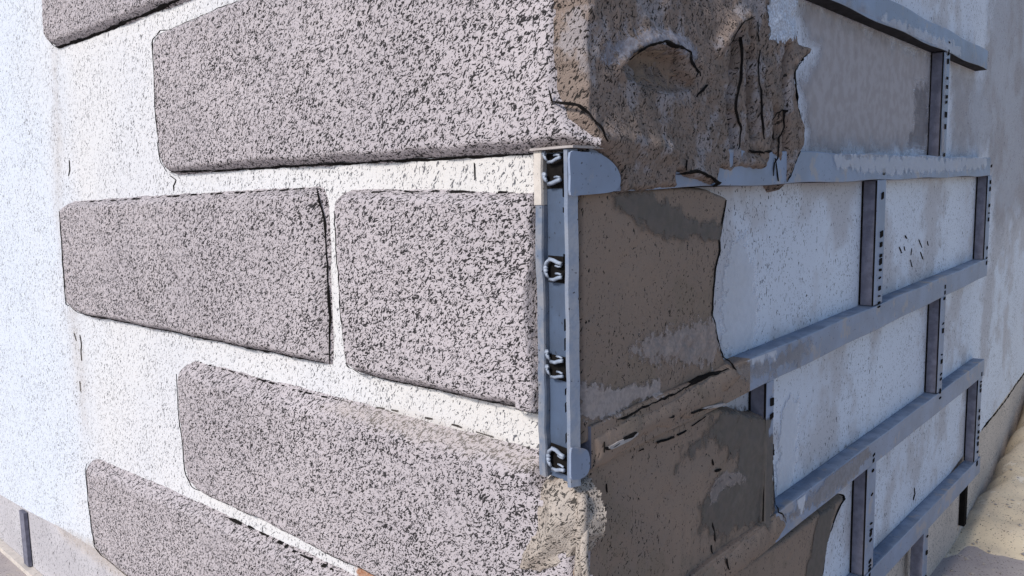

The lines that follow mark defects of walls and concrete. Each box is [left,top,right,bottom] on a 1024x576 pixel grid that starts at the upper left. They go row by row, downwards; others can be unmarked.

crack [629,40,709,97]
crack [727,16,811,182]
crack [603,160,736,453]
peeling [608,433,639,449]